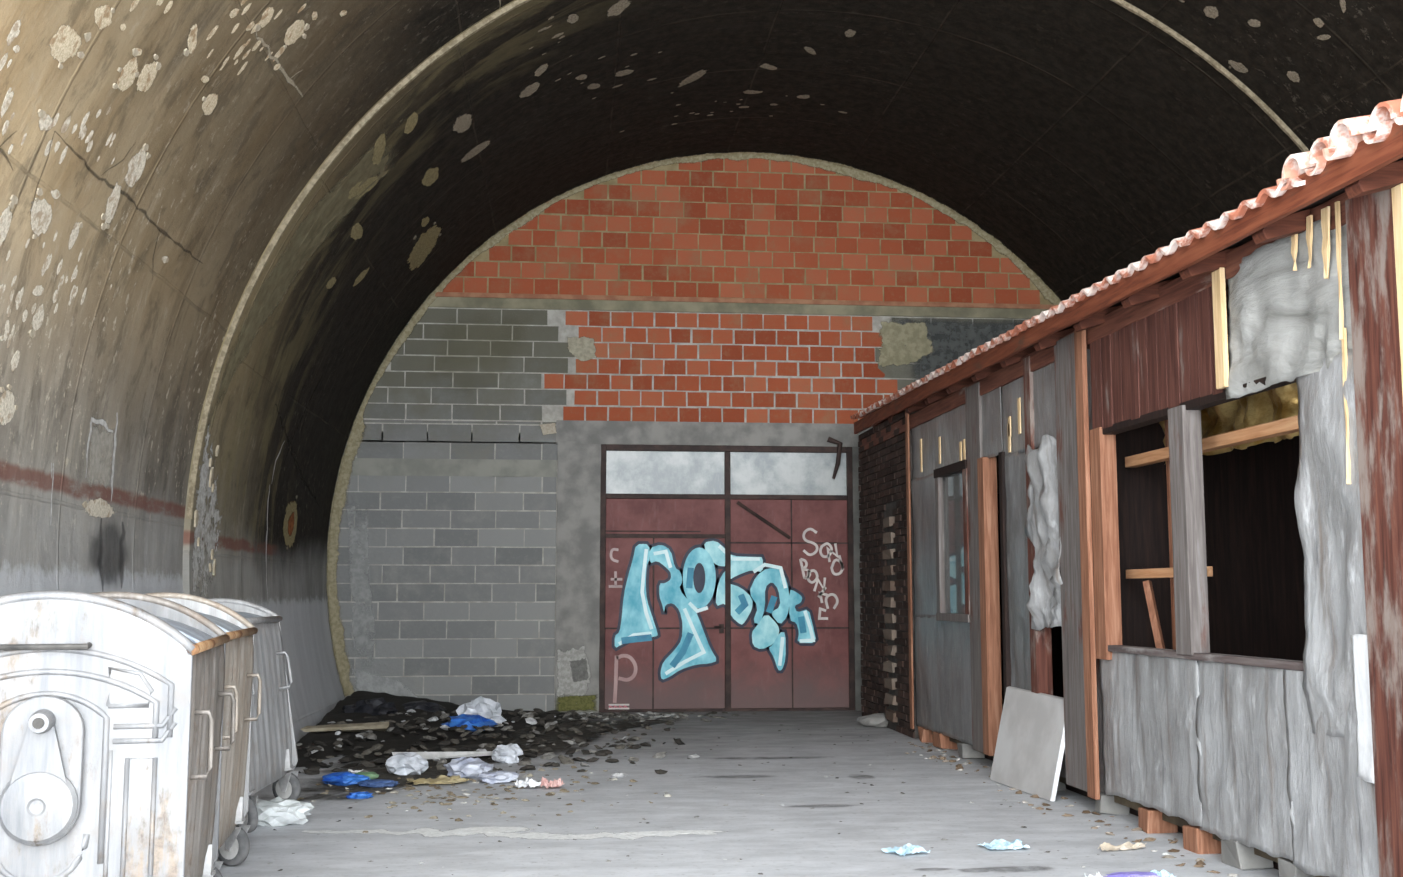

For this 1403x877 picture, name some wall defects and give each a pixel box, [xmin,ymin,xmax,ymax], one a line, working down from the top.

peeling [0,20,21,71]
spalling [49,0,173,69]
spalling [112,48,161,92]
peeling [184,0,317,116]
spalling [453,113,472,133]
spalling [519,14,656,99]
spalling [607,0,631,17]
spalling [671,69,847,125]
peeling [1,87,151,230]
spalling [407,216,442,271]
spalling [0,188,87,425]
water stain [93,518,125,592]